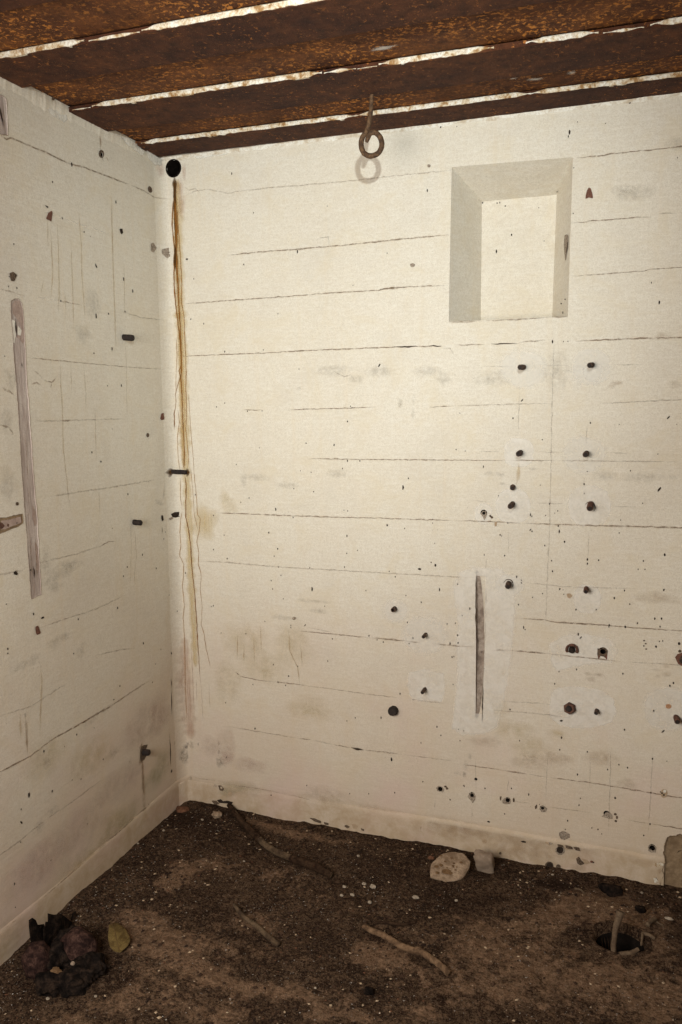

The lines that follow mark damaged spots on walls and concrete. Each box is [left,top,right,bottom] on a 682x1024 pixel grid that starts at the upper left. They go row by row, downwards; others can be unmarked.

rust [167,179,210,671]